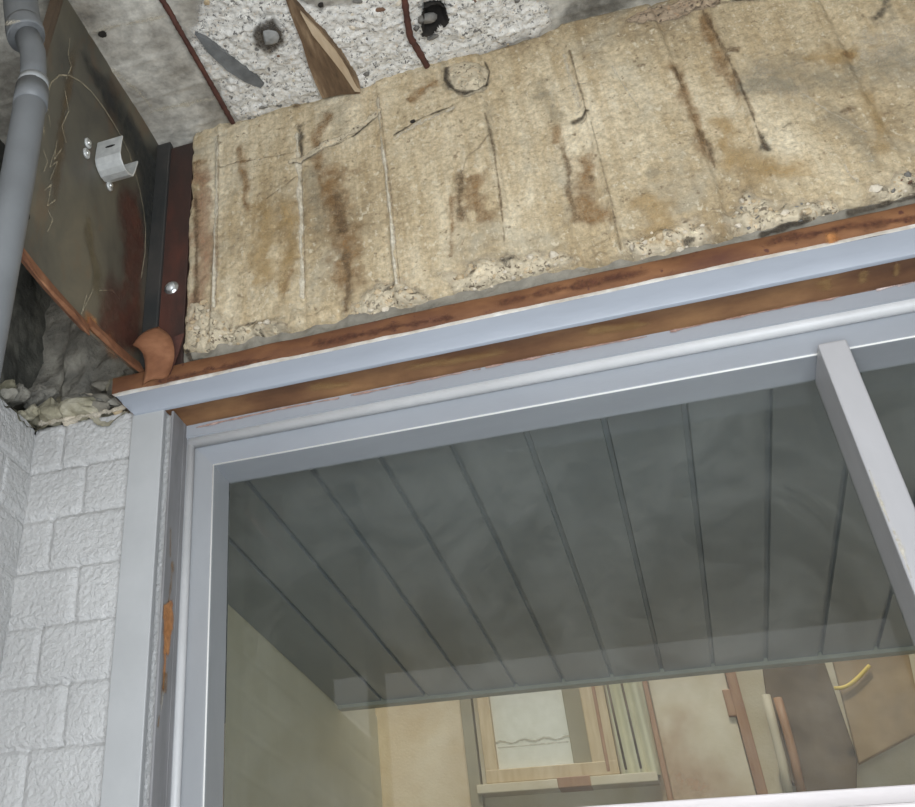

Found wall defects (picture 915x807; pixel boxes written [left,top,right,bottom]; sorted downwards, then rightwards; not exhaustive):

spalling [190,0,551,121]
crack [394,62,490,137]
crack [563,50,589,124]
corrosion [192,160,210,303]
crack [232,108,382,190]
corrosion [315,142,358,311]
corrosion [449,173,490,220]
corrosion [555,131,606,223]
spalling [724,193,839,235]
spalling [871,172,915,204]
corrosion [21,203,915,394]
spalling [112,221,915,397]